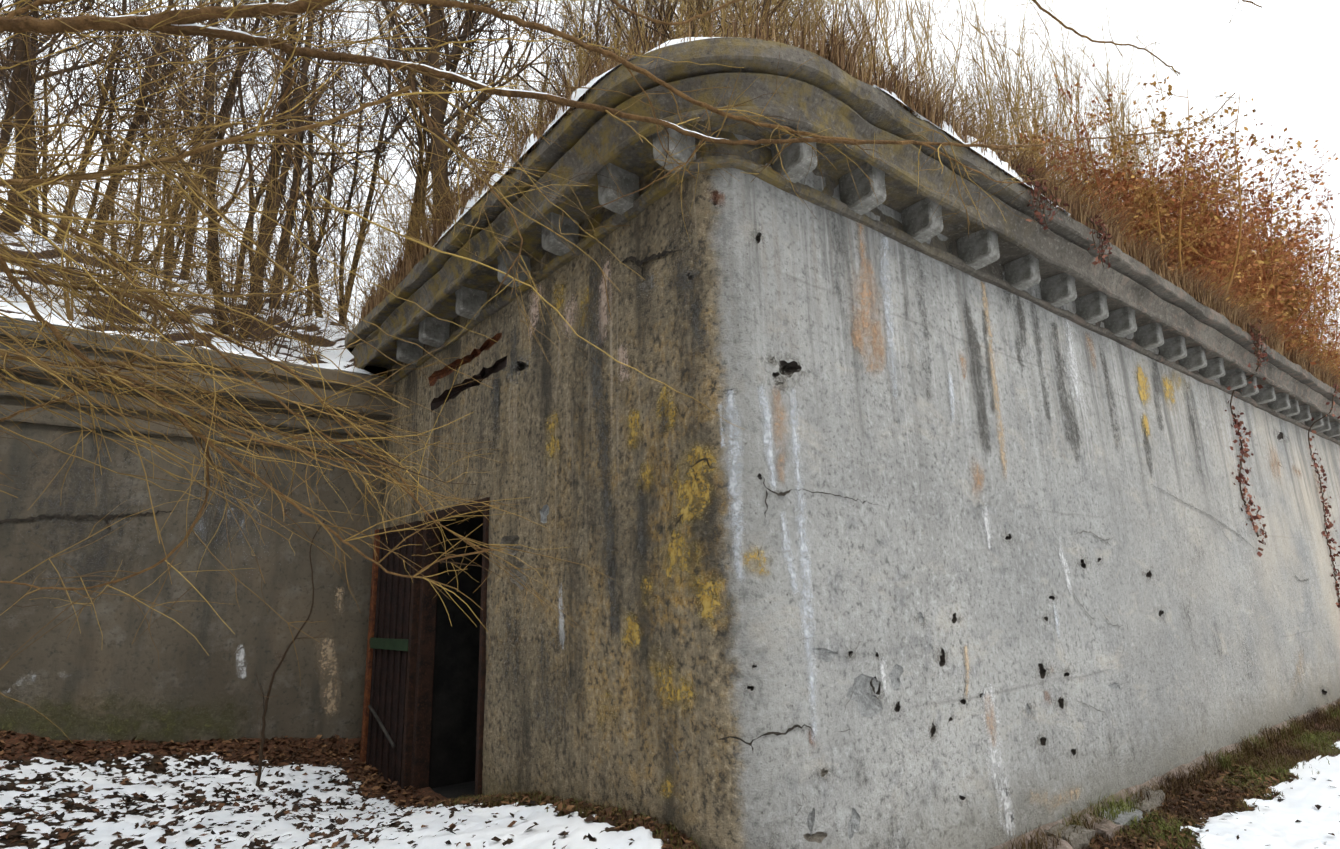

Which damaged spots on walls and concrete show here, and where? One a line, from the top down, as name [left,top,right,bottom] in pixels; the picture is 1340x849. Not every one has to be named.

hole [768,356,810,389]
water stain [965,303,995,450]
water stain [1002,274,1081,460]
crack [0,510,180,531]
efflorescence [721,391,744,578]
efflorescence [760,391,776,486]
efflorescence [782,409,815,704]
crack [761,475,878,517]
crack [718,641,861,751]
spalling [936,648,948,667]
spalling [929,693,985,740]
spalling [1038,663,1070,679]